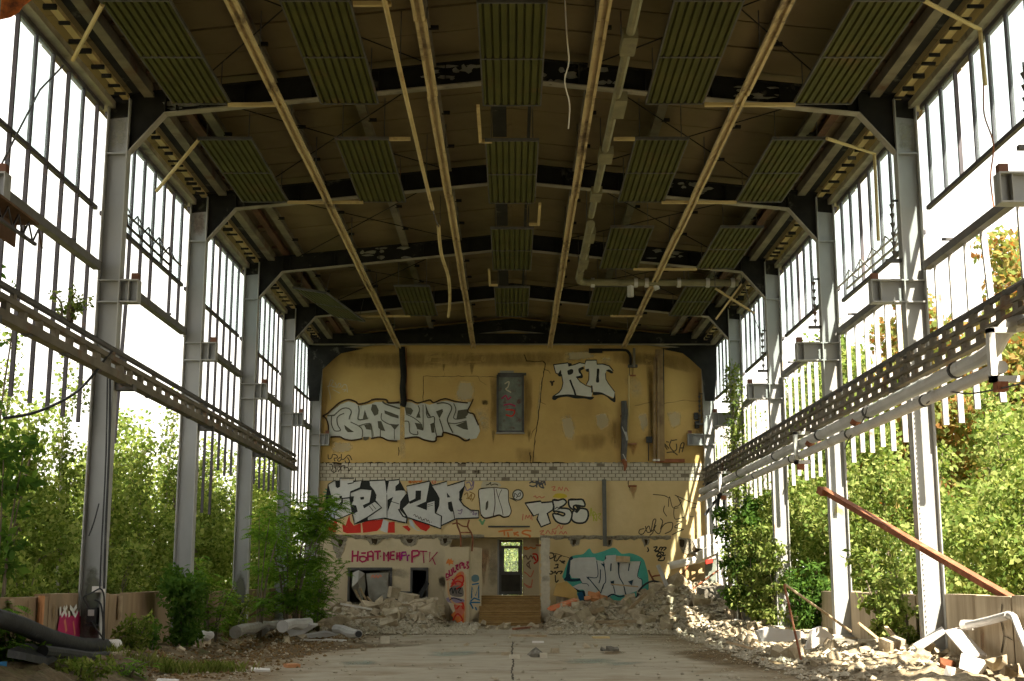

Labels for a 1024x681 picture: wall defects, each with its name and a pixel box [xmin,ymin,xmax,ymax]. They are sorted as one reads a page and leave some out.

peeling [420,64,480,80]
crack [524,355,550,467]